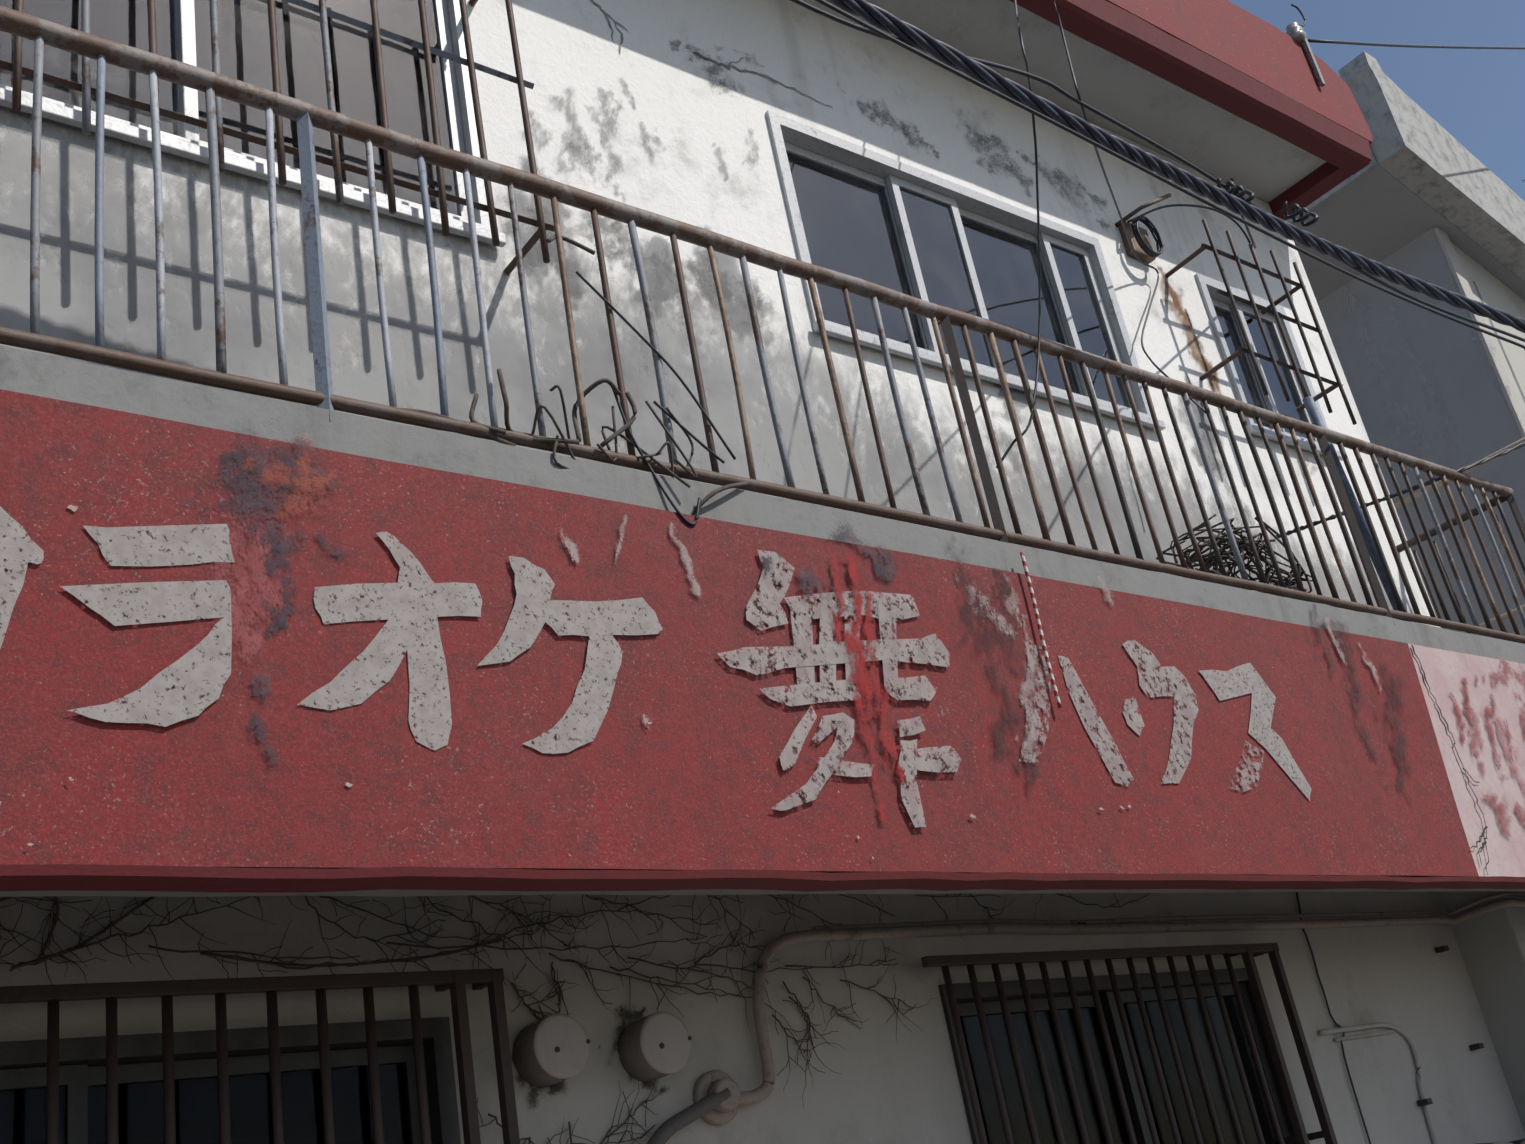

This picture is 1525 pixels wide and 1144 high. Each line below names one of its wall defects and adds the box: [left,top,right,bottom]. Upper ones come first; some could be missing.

crack [591,0,628,54]
crack [693,52,833,108]
rust [1159,267,1221,394]